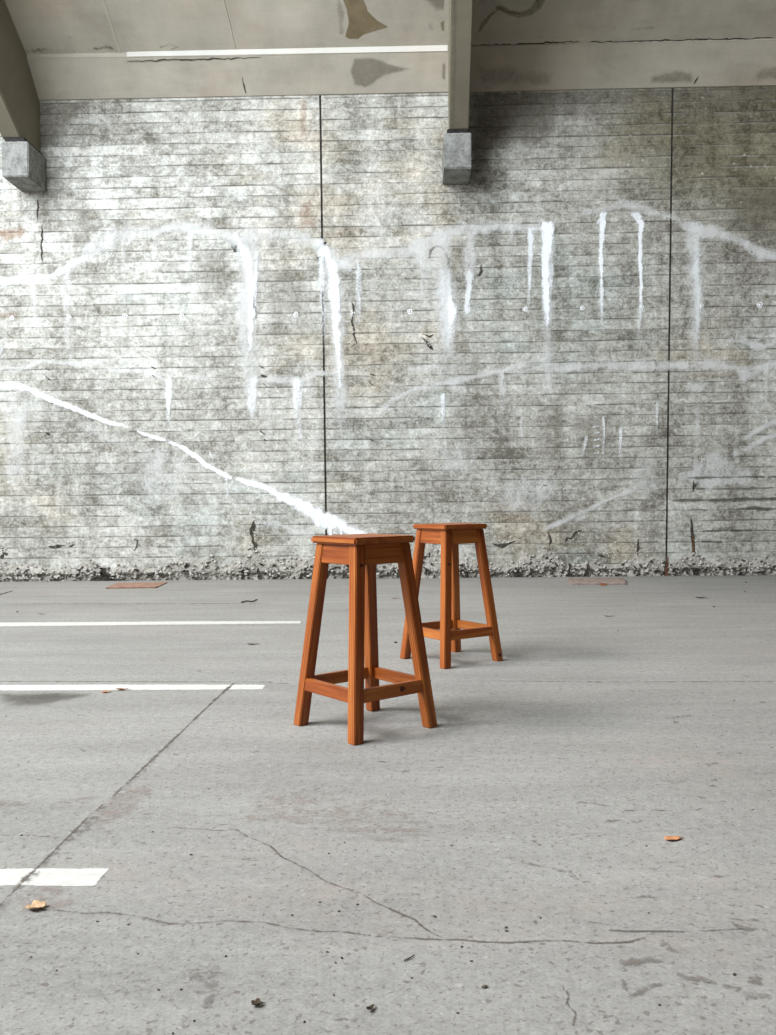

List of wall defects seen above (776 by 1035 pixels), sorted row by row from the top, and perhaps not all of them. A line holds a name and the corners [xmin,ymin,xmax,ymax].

damp [343,0,387,39]
damp [351,59,398,86]
damp [430,0,455,81]
damp [620,201,670,321]
damp [0,210,776,438]
crack [247,516,266,555]
crack [190,828,741,944]